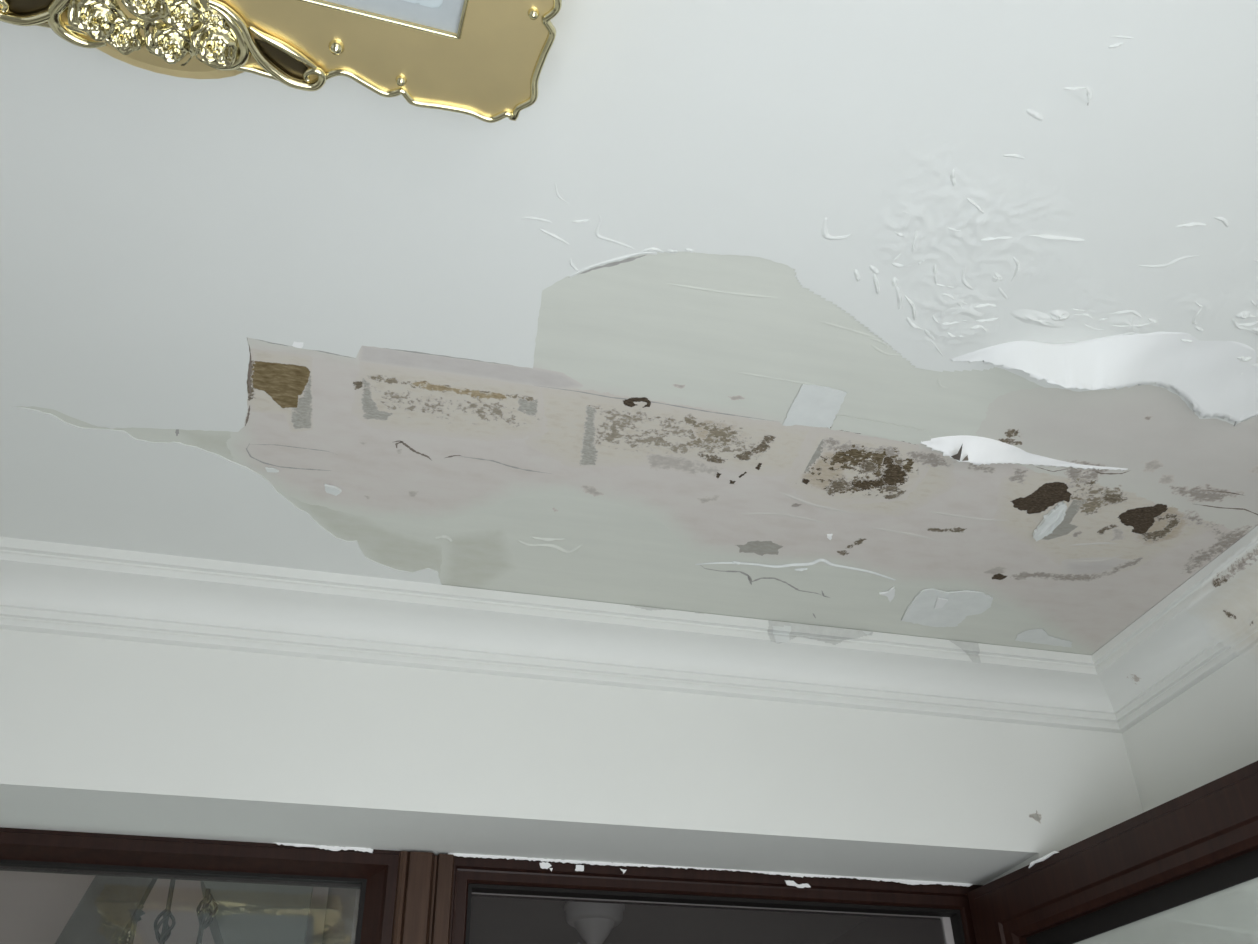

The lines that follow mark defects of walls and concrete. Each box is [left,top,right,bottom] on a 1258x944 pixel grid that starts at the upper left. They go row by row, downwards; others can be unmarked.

water stain [247,348,313,433]
water stain [353,374,543,428]
flaking render [16,251,1258,655]
water stain [579,397,776,503]
water stain [789,429,1258,665]